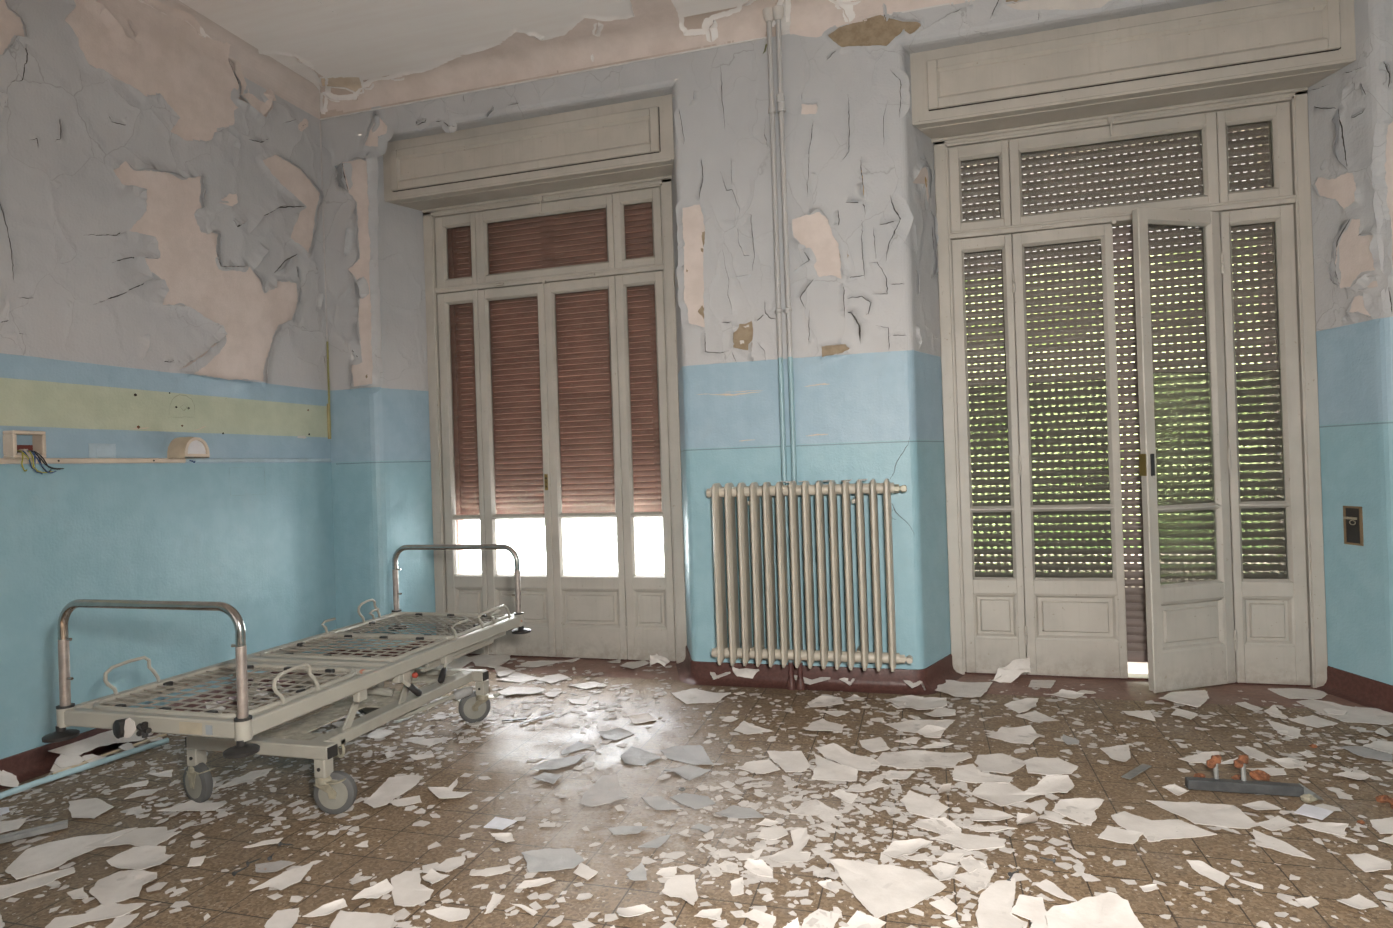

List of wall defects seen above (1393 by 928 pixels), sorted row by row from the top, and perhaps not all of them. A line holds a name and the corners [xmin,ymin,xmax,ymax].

peeling [1379,60,1393,88]
peeling [0,0,1124,396]
peeling [1311,108,1393,326]